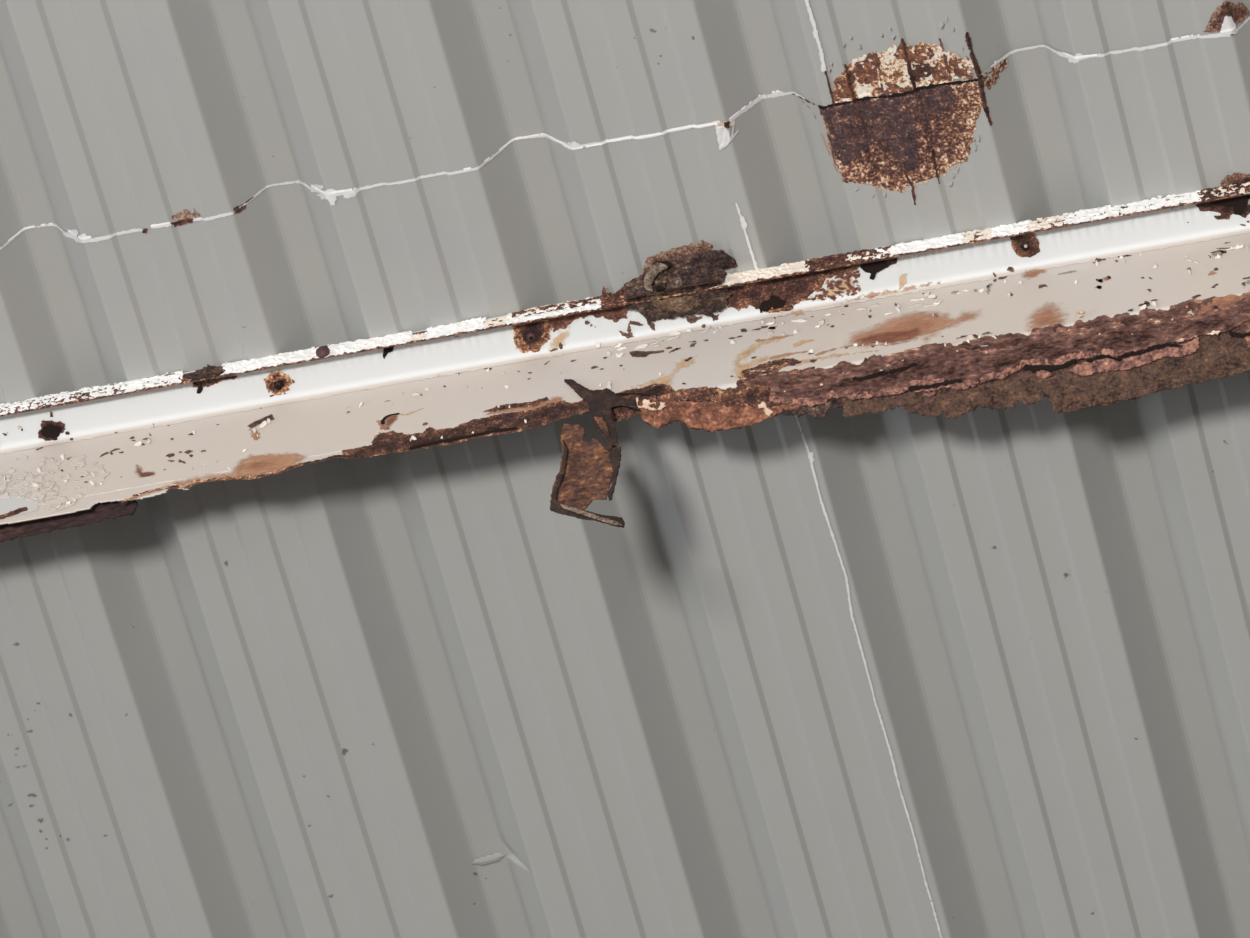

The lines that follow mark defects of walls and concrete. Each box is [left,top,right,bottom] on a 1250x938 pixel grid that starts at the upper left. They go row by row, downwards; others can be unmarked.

crack [991,17,1250,68]
crack [0,0,834,251]
rust [793,32,1008,205]
crack [735,203,758,270]
rust [726,245,897,316]
peeling [591,182,1250,387]
rust [1196,172,1250,220]
peeling [0,370,184,415]
peeling [221,297,601,375]
rust [606,312,974,422]
peeling [0,423,231,516]
crack [795,415,942,938]